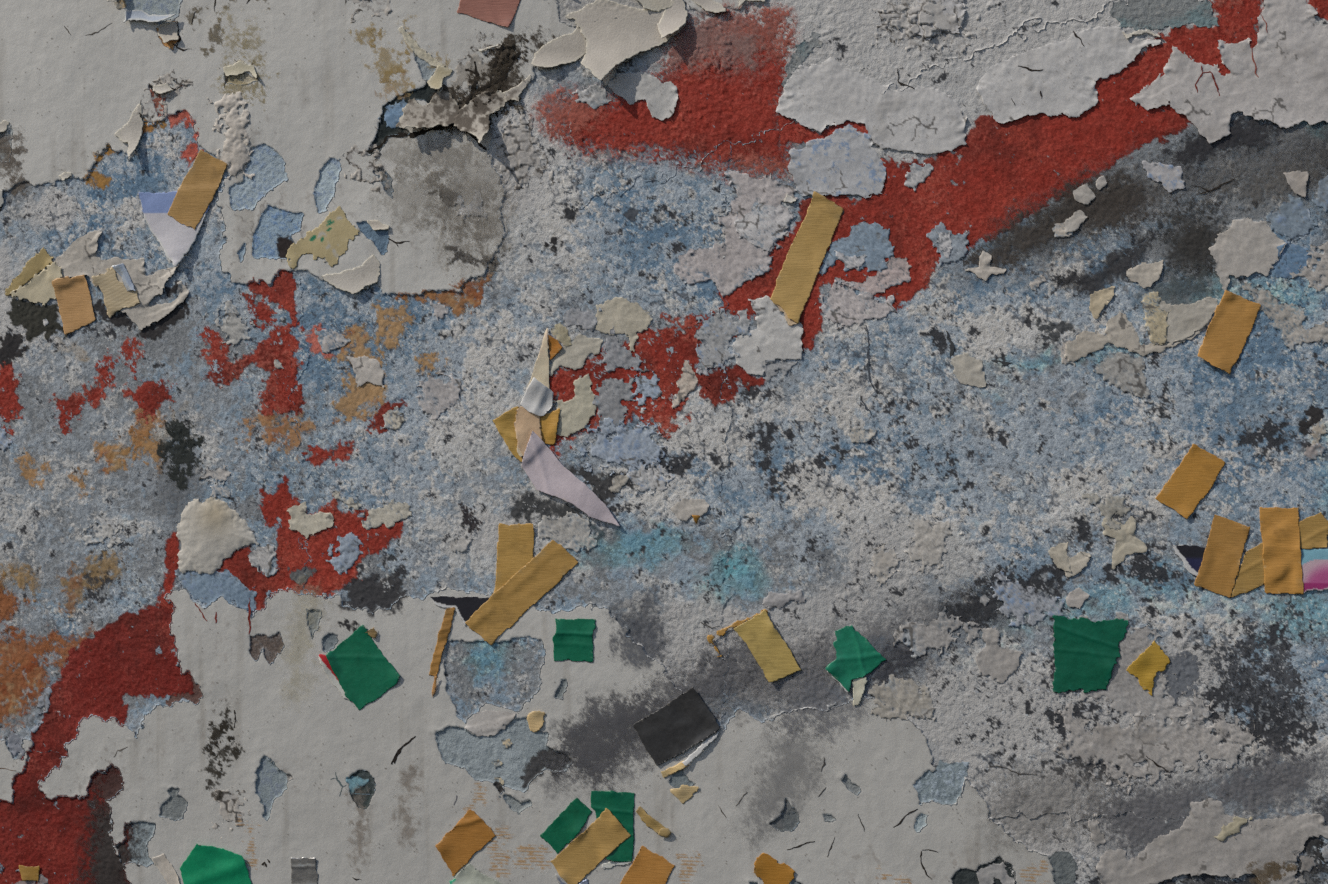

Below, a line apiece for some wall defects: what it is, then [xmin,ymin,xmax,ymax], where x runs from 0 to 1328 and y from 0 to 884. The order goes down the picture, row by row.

crack [1011,66,1043,105]
crack [1195,66,1220,96]
peeling [228,143,288,211]
peeling [313,158,341,213]
peeling [428,185,488,222]
peeling [237,205,304,262]
peeling [356,220,389,255]
peeling [288,555,317,585]
peeling [326,532,364,575]
peeling [48,634,203,758]
peeling [113,787,187,867]
peeling [0,859,70,884]